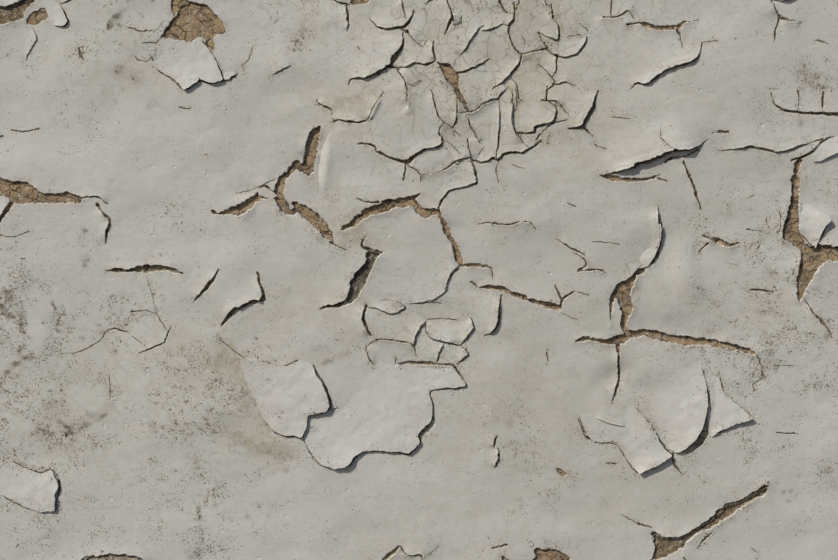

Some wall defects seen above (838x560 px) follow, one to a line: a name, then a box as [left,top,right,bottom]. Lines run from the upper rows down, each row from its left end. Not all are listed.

peeling [153,0,226,91]
crack [201,40,253,82]
crack [317,0,718,187]
crack [771,0,801,41]
crack [771,91,838,116]
peeling [0,177,111,243]
peeling [212,126,588,320]
crack [601,126,834,210]
peeling [782,159,838,337]
peeling [576,209,763,404]
peeling [579,361,753,474]
peeling [651,485,768,560]